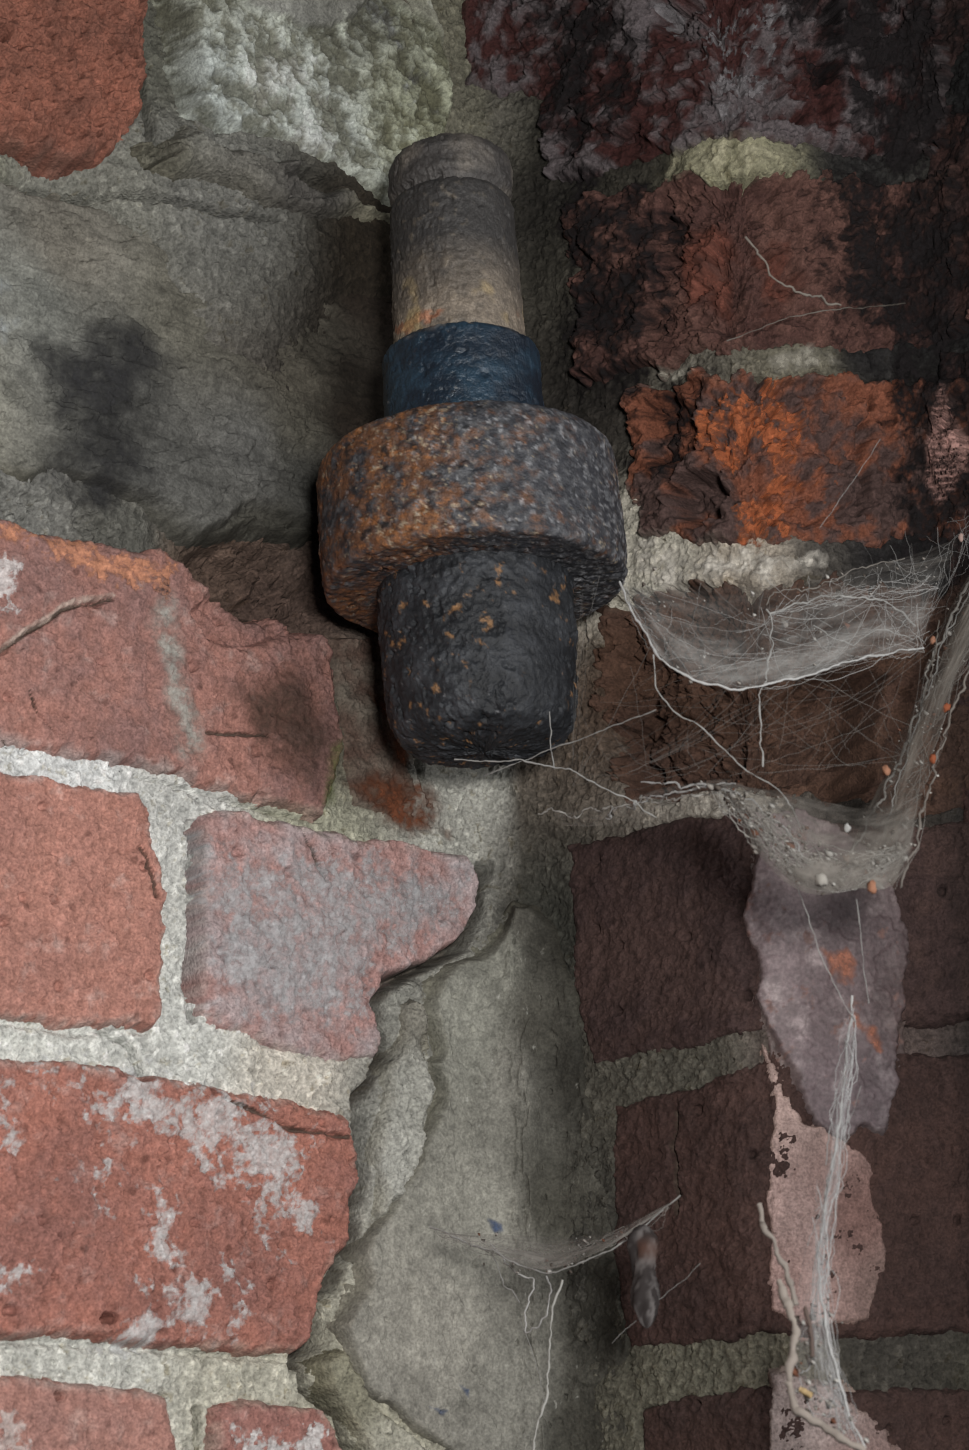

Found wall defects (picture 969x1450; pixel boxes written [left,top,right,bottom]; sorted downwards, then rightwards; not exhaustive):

corrosion [362,776,433,829]
crack [369,929,467,1002]
efflorescence [84,1069,316,1231]
efflorescence [145,1199,179,1264]
crack [317,1197,353,1295]
efflorescence [110,1278,218,1353]
efflorescence [0,1411,32,1450]
efflorescence [231,1421,329,1450]